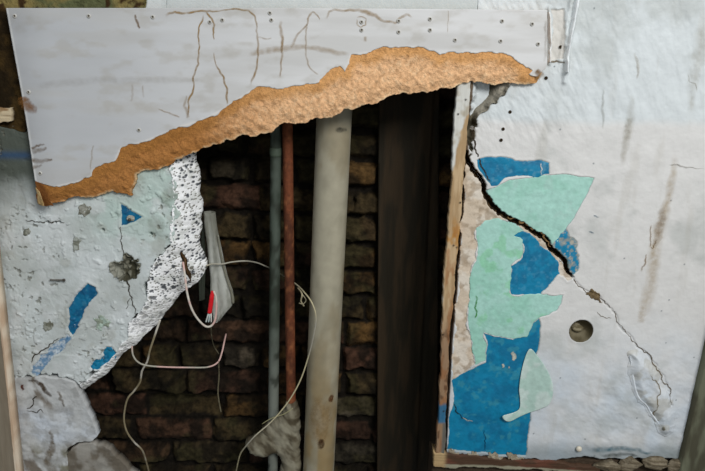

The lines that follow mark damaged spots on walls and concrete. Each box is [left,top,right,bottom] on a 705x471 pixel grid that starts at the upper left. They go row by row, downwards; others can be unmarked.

flaking render [0,0,147,132]
peeling [32,284,98,376]
spalling [78,152,208,389]
peeling [447,83,594,460]
crack [465,130,671,421]